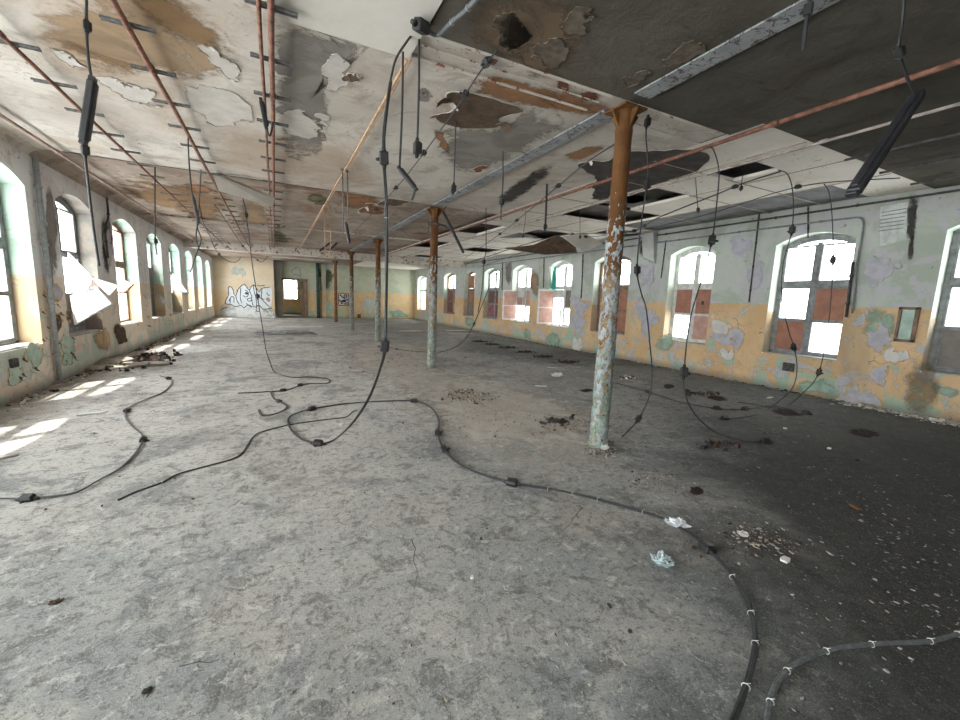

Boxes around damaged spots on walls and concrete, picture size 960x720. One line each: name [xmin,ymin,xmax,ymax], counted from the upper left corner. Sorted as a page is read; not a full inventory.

peeling [96,77,163,108]
damp [39,0,229,79]
peeling [184,45,253,127]
peeling [278,109,330,140]
peeling [321,53,363,92]
flaking render [430,91,526,133]
peeling [492,0,596,69]
flaking render [562,148,710,448]
peeling [7,283,79,388]
peeling [710,314,744,360]
peeling [835,323,911,414]
damp [906,365,939,411]